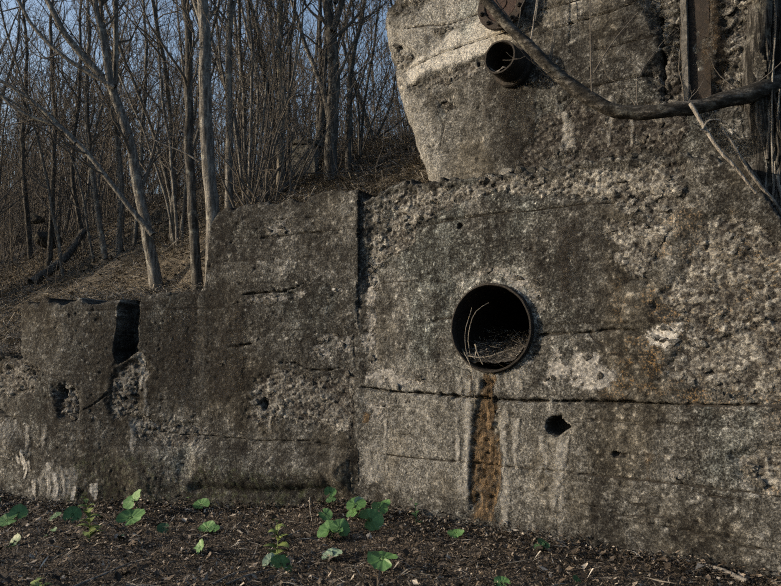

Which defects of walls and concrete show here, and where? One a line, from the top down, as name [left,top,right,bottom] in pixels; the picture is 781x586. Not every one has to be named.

spalling [713,0,751,93]
spalling [246,100,781,432]
rust [470,374,503,520]